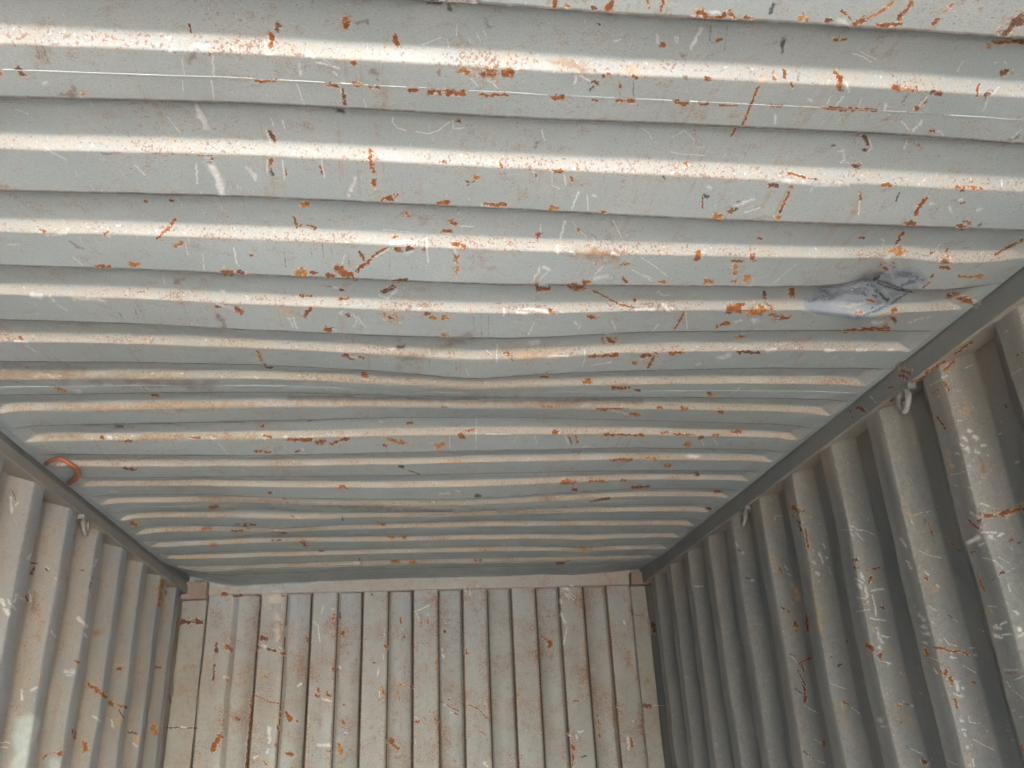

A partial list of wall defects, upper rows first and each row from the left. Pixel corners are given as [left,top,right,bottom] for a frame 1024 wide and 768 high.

rust [794,0,917,44]
rust [405,61,521,101]
rust [672,67,803,139]
rust [819,66,880,115]
rust [887,81,951,148]
rust [772,134,874,222]
rust [154,217,187,251]
rust [291,232,421,334]
rust [700,236,821,357]
rust [593,408,743,448]
rust [966,498,1024,532]
rust [207,590,366,768]